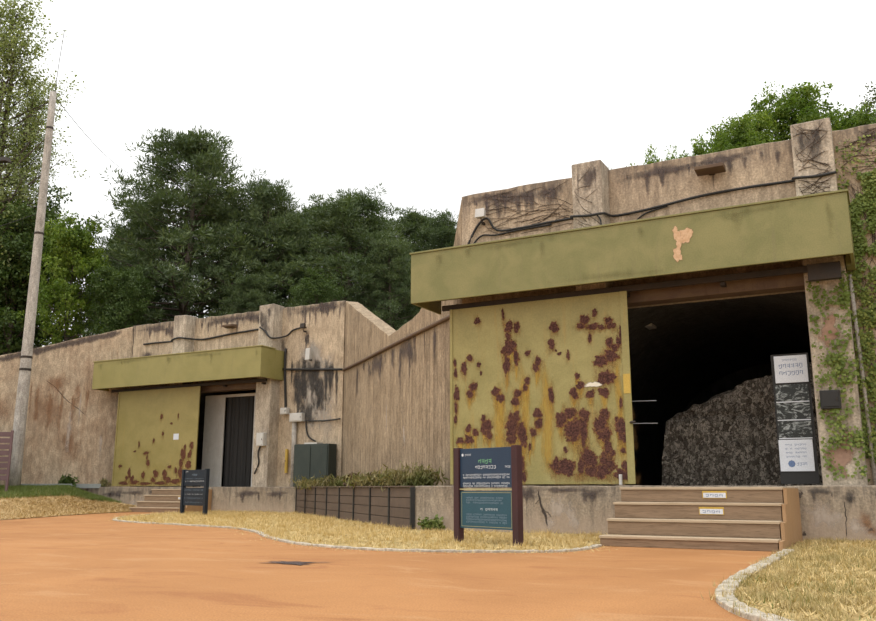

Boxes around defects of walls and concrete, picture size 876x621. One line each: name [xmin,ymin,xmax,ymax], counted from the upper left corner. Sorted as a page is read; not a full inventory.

damp [577,169,596,187]
damp [627,164,690,189]
damp [701,154,746,171]
damp [475,187,561,217]
peeling [672,226,693,262]
rust [453,308,633,482]
rust [118,414,194,485]